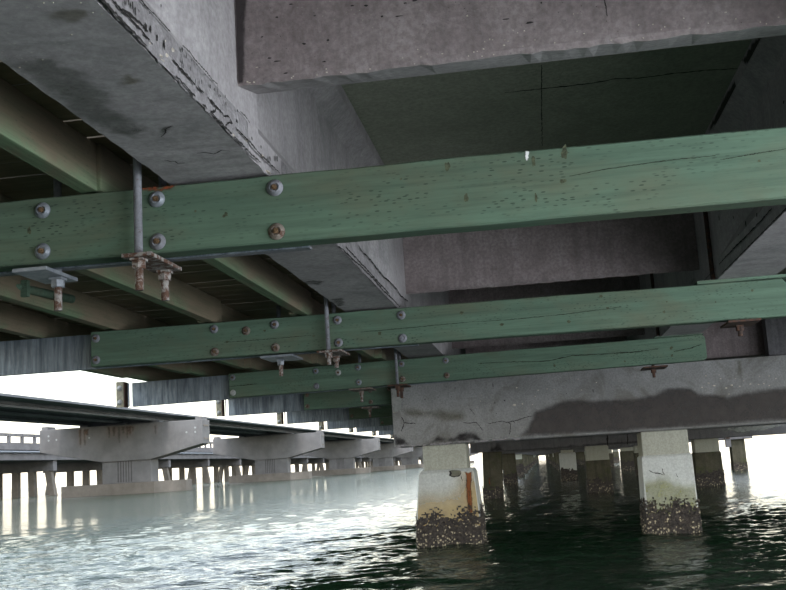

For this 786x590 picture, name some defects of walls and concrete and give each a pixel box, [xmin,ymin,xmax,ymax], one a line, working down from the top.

spalling [92,0,253,155]
crack [505,65,734,146]
spalling [336,242,406,308]
crack [463,409,531,434]
leakage [524,389,786,446]
rust [465,472,473,513]